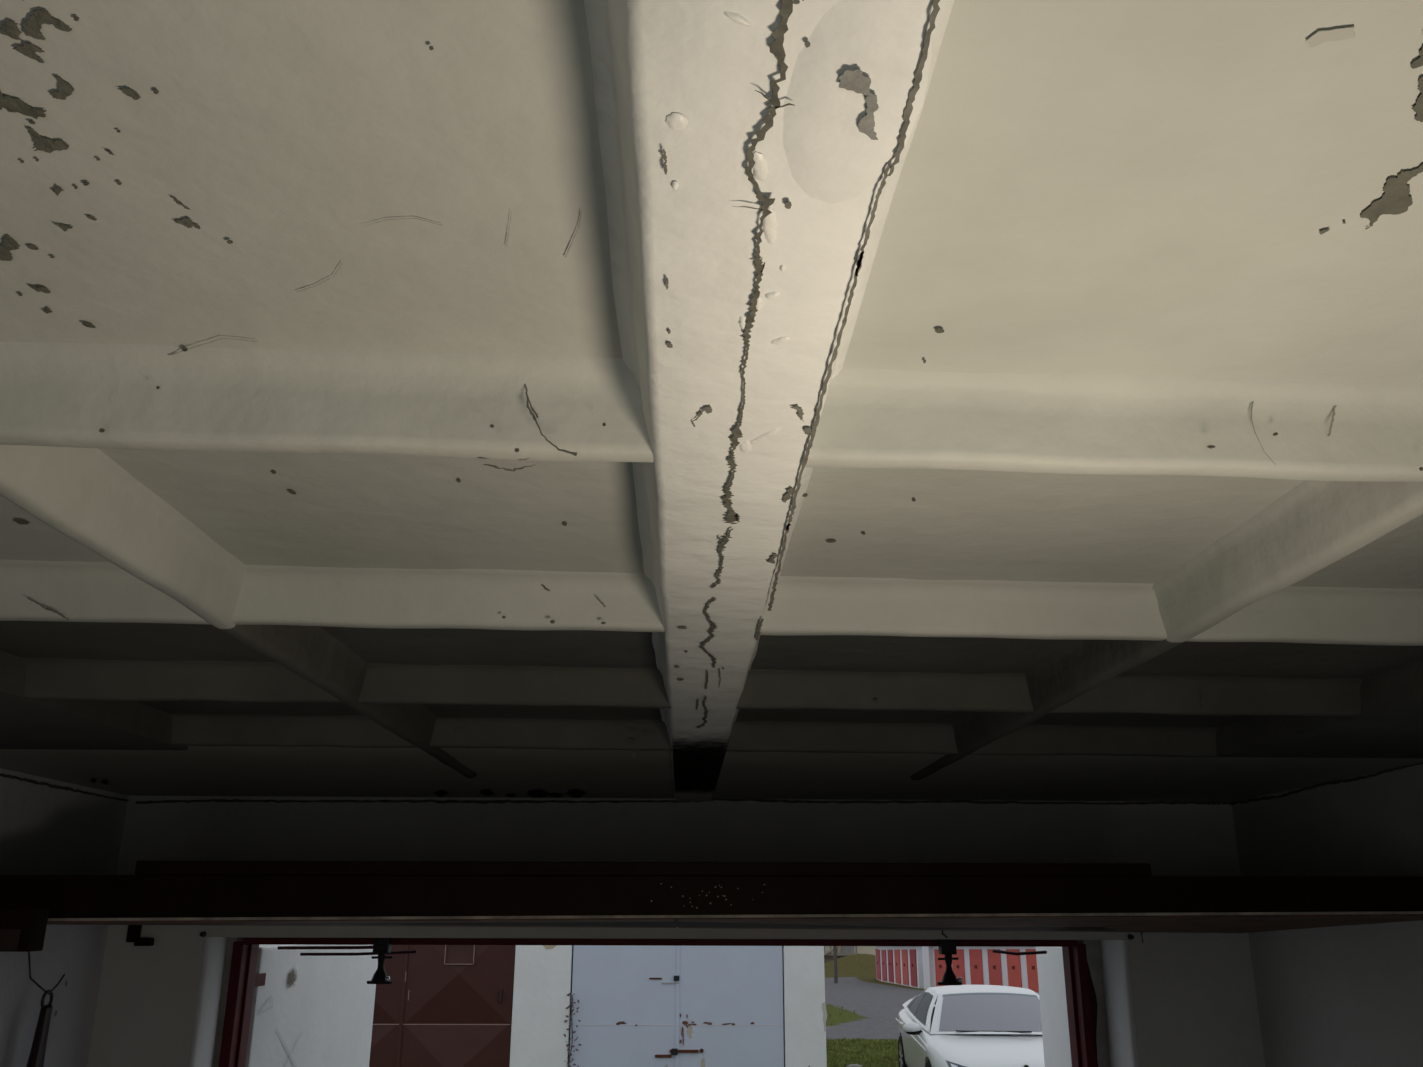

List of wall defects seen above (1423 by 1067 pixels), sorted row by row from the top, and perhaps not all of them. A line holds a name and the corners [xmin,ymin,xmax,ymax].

peeling [0,0,79,63]
peeling [0,76,74,163]
peeling [117,88,159,100]
spalling [839,69,879,140]
peeling [1410,46,1423,122]
peeling [0,235,55,261]
peeling [170,196,200,229]
peeling [1319,164,1423,235]
peeling [18,285,52,314]
crack [755,0,940,640]
crack [696,0,804,728]
crack [524,384,577,456]